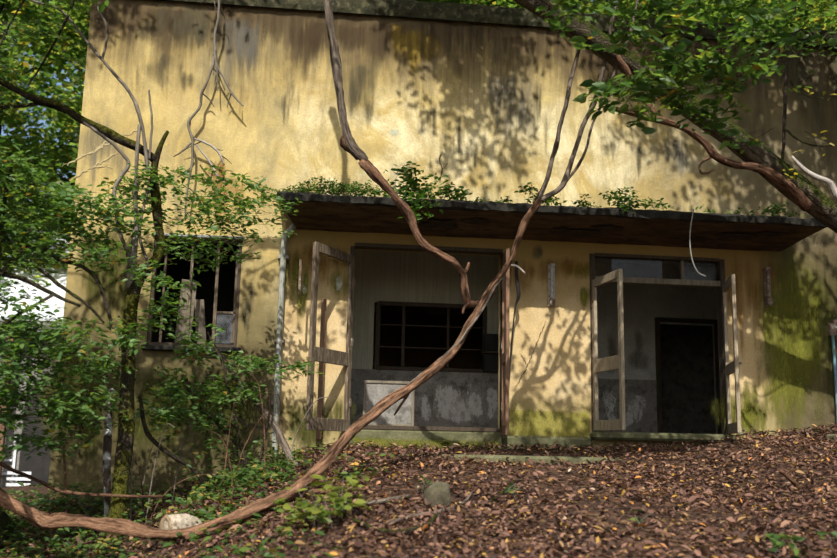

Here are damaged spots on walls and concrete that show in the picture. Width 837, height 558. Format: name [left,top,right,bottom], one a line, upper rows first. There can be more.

leakage [286,256,308,313]
leakage [721,259,834,434]